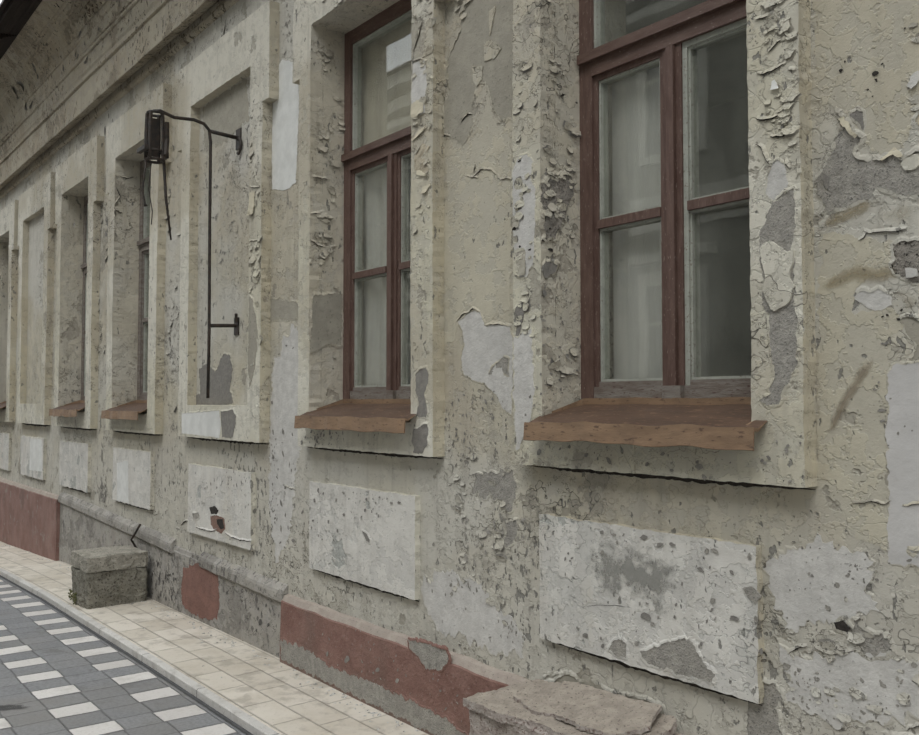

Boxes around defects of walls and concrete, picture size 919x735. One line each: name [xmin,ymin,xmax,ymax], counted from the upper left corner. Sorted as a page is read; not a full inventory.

peeling [199,0,300,215]
peeling [410,44,434,214]
peeling [444,0,538,146]
peeling [764,80,802,148]
spalling [814,105,919,214]
spalling [758,185,805,410]
spalling [163,304,238,439]
spalling [407,108,581,696]
crack [527,465,816,490]
peeling [280,632,469,735]
spalling [542,669,667,714]
spalling [599,583,725,686]